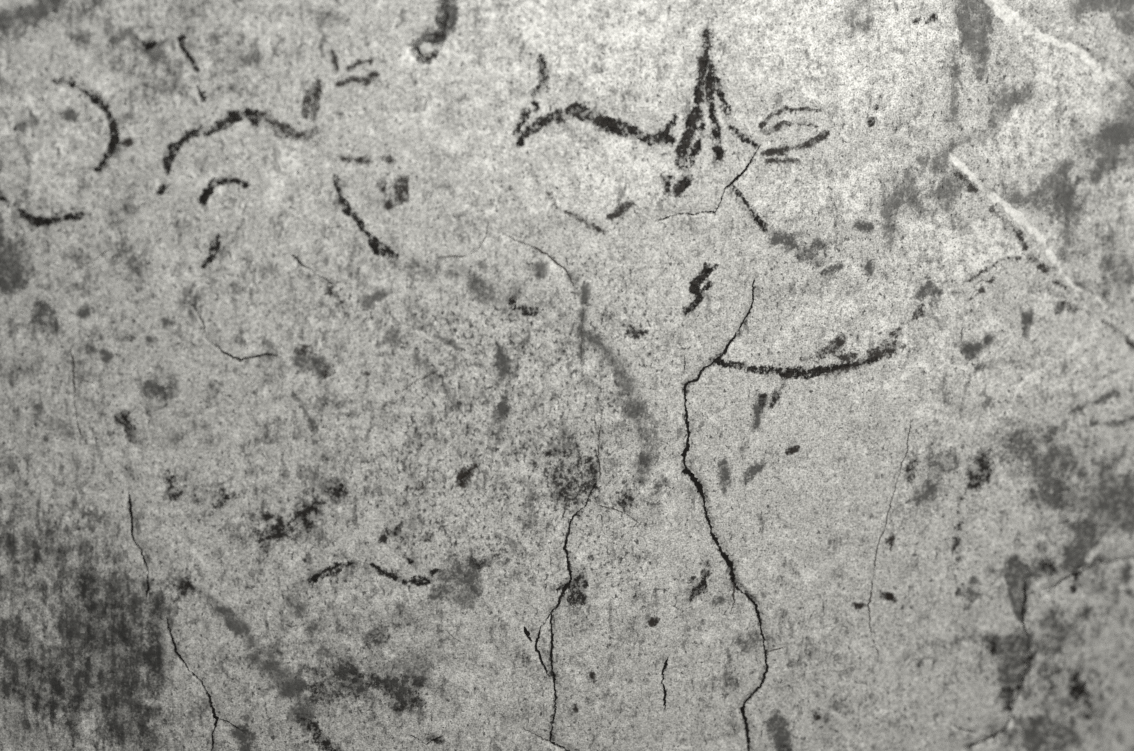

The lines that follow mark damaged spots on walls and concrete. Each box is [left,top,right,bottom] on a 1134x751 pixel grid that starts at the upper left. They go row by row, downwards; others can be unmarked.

crack [523,326,641,751]
crack [661,656,669,711]
crack [681,279,783,751]